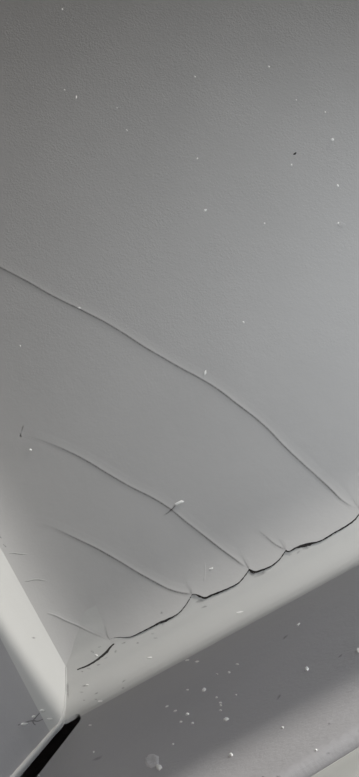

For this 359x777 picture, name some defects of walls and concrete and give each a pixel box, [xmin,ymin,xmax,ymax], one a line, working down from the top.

crack [0,258,359,670]